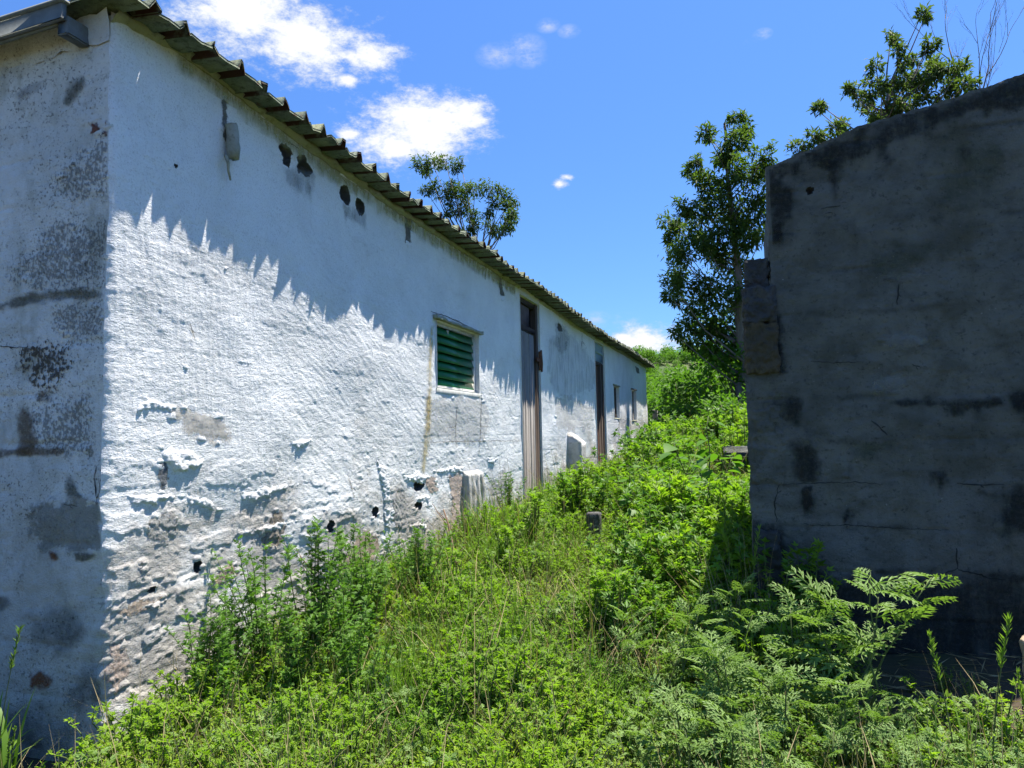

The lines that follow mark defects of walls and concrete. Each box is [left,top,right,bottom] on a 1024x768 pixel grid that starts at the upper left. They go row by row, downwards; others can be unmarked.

leakage [65,78,83,104]
leakage [1,289,96,307]
flaking render [151,458,169,495]
leakage [795,445,816,510]
flaking render [144,512,179,540]
flaking render [261,507,287,553]
flaking render [192,555,242,584]
flaking render [99,586,167,697]